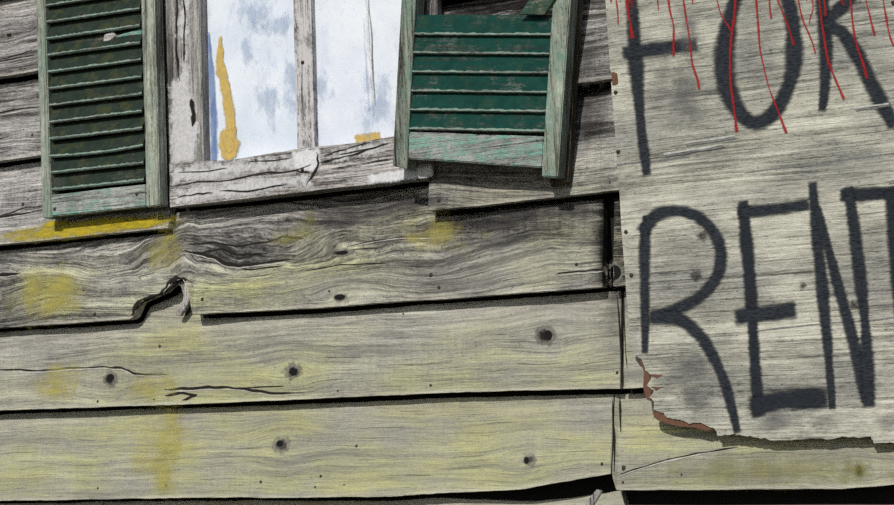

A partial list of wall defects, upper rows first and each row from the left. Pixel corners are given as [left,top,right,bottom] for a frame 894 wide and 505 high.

water stain [4,215,170,241]
crack [0,366,304,400]